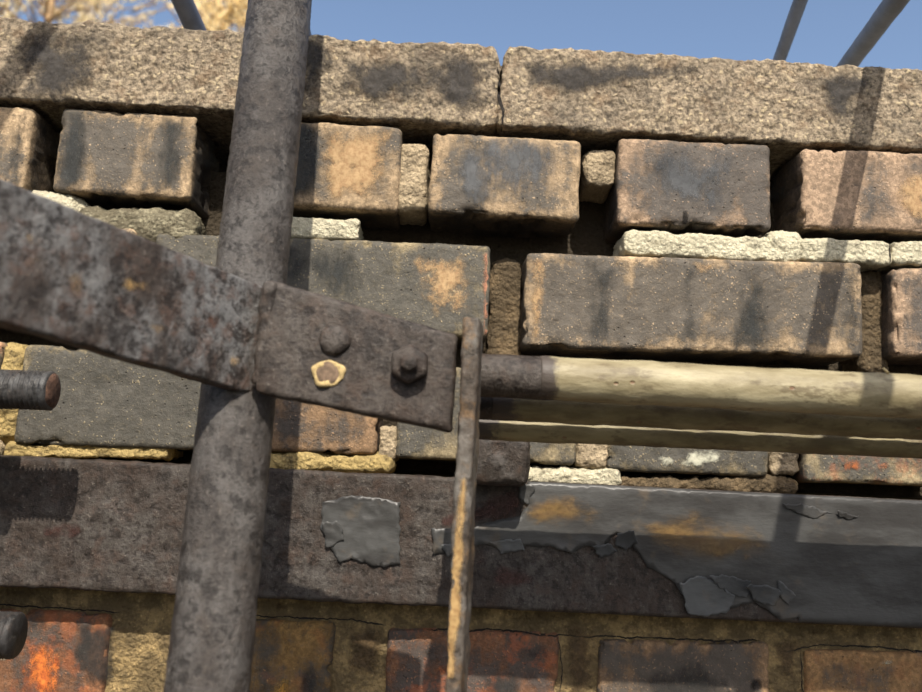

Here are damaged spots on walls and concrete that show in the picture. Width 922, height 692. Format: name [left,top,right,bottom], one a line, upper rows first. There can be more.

damp [305,41,327,90]
damp [350,57,481,107]
peeling [320,495,401,567]
peeling [431,528,451,557]
peeling [474,482,922,628]
corrosion [656,526,749,556]
corrosion [31,649,58,692]
crack [794,644,922,692]